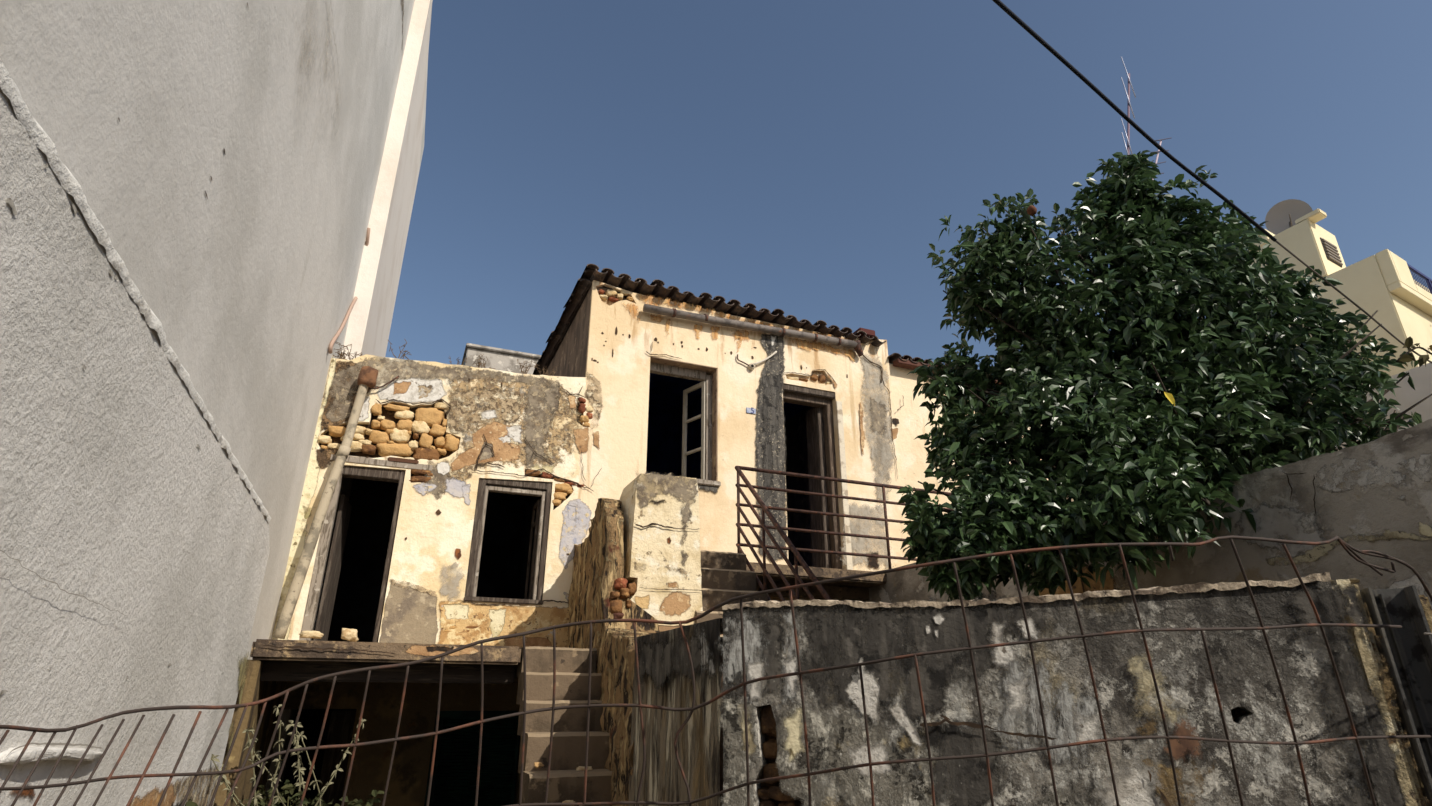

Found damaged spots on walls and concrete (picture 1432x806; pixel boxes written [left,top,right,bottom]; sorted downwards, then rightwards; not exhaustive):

crack [0,550,126,616]
flaking render [316,448,338,469]
peeling [321,327,631,515]
flaking render [390,548,570,656]
peeling [559,499,591,569]
leakage [755,332,788,561]
leakage [841,355,894,569]
leakage [637,594,1049,806]